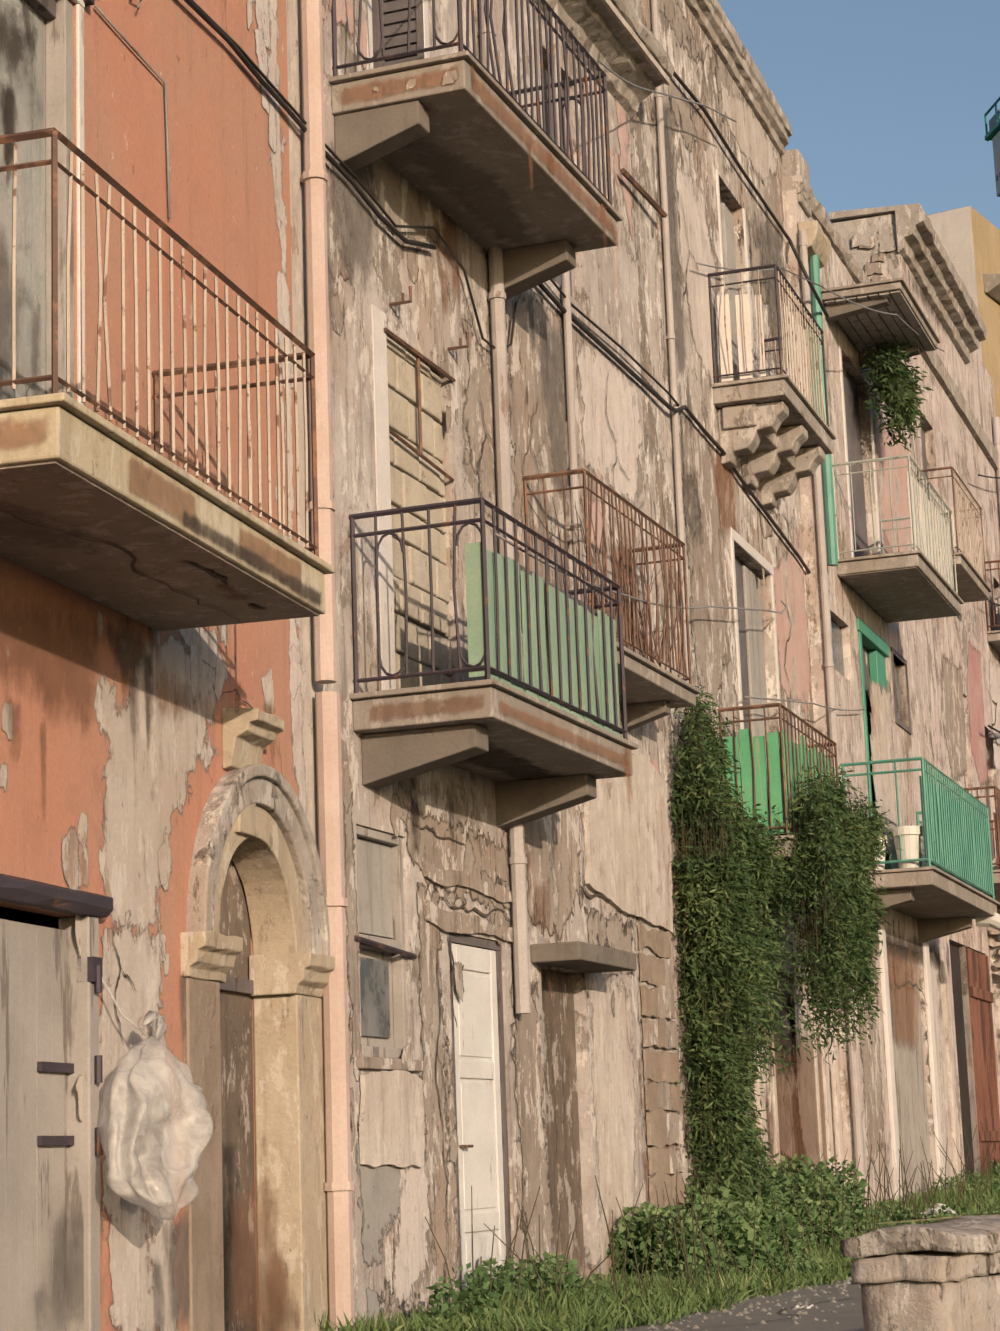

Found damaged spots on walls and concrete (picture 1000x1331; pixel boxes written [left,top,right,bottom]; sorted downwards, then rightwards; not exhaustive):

peeling [247,0,295,540]
crack [0,510,266,624]
peeling [0,763,8,792]
peeling [2,701,13,741]
peeling [261,618,311,817]
crack [581,839,641,921]
peeling [62,625,244,1331]
spalling [989,905,1000,976]
peeling [342,759,684,1323]